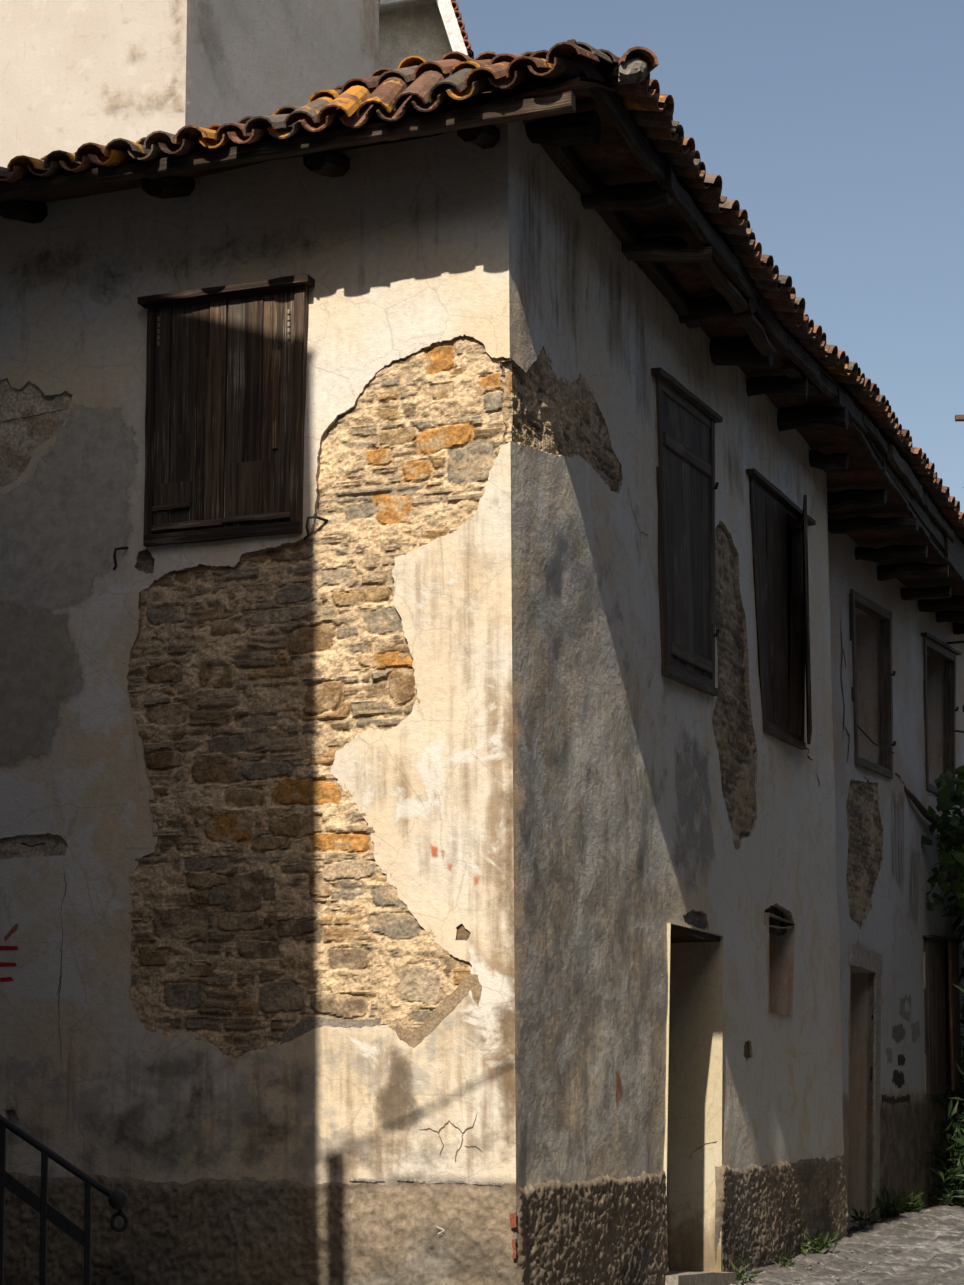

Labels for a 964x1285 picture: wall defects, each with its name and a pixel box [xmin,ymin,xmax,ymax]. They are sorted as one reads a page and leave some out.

spalling [0,378,73,487]
spalling [123,334,623,1060]
spalling [712,521,757,849]
spalling [0,833,68,860]
spalling [846,777,884,930]
crack [56,871,66,1063]
damp [378,1054,417,1127]
crack [418,1114,482,1162]
damp [500,1009,517,1118]
peeling [870,993,920,1107]